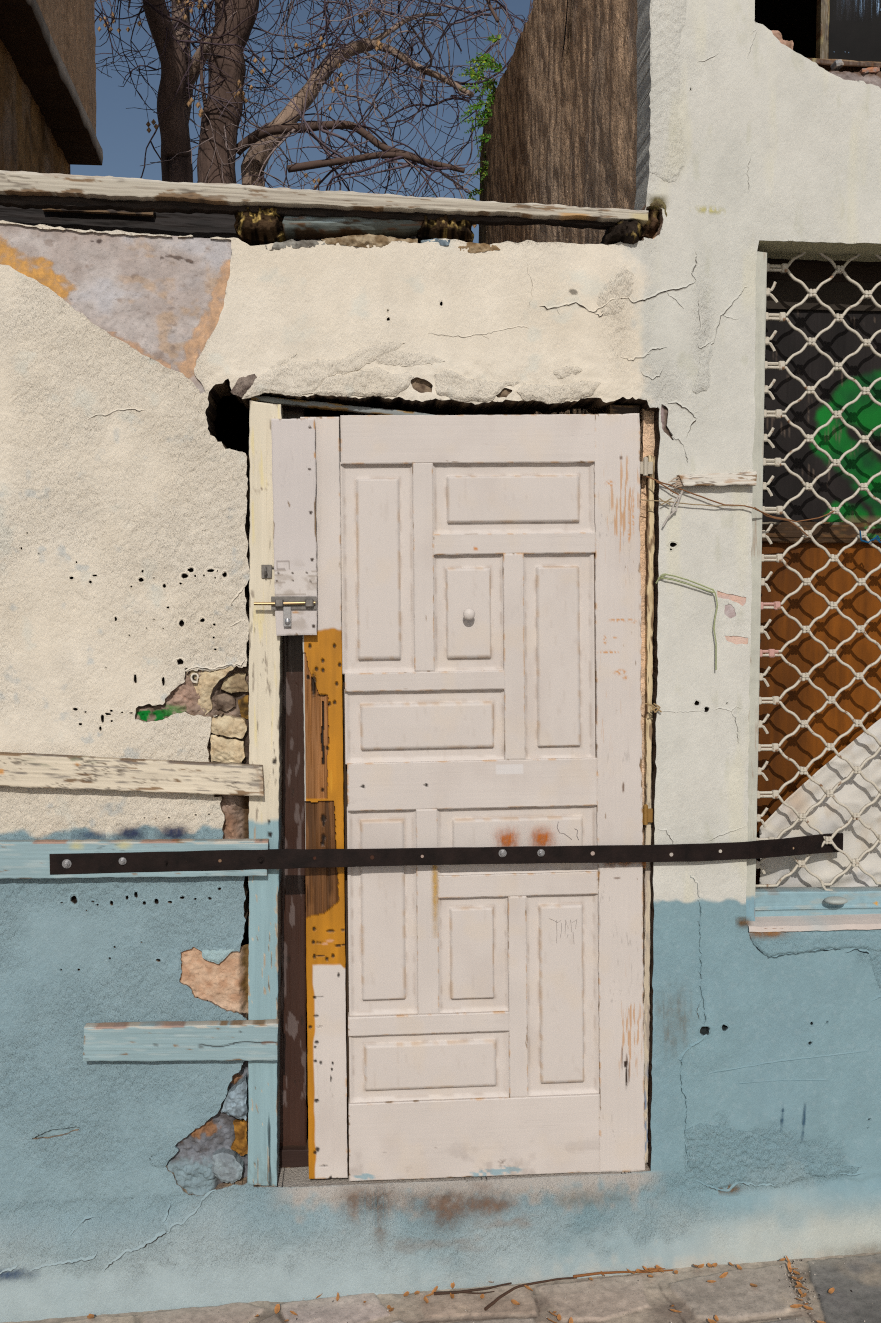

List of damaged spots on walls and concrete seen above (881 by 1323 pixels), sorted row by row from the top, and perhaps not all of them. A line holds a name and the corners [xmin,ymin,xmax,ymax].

flaking render [829,71,881,88]
peeling [0,224,232,393]
crack [428,253,747,465]
flaking render [136,666,250,764]
rust [501,833,514,846]
rust [534,833,548,846]
flaking render [166,935,249,1013]
crack [678,875,777,1192]
flaking render [150,1061,249,1196]
crack [0,1189,216,1274]